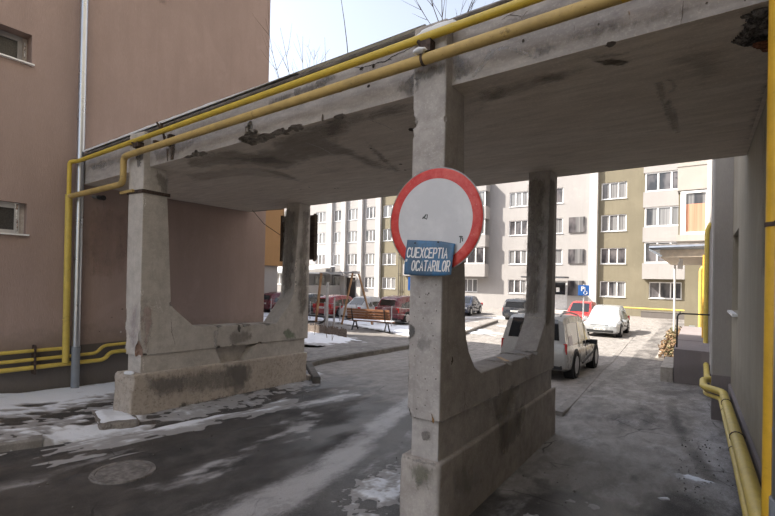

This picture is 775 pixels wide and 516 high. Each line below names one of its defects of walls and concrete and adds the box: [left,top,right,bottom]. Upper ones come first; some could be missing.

peeling [731,7,769,52]
spalling [238,121,304,146]
spalling [120,308,147,357]
leakage [151,366,246,393]